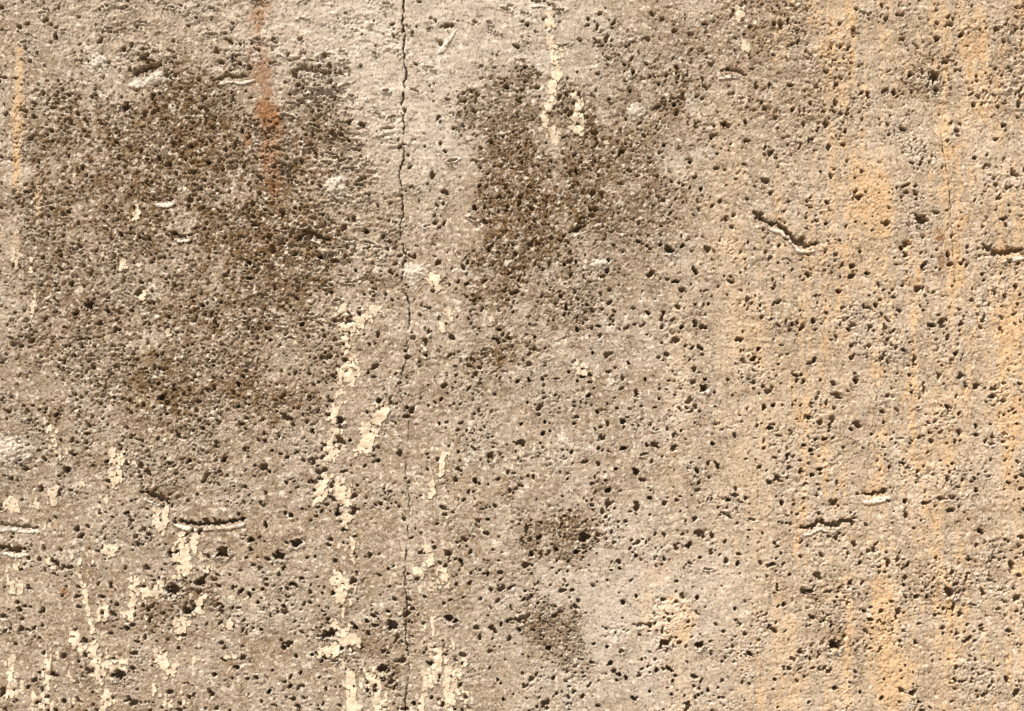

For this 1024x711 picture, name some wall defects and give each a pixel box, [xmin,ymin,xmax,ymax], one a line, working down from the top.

corrosion [240,0,285,199]
peeling [0,550,29,595]
peeling [3,647,77,711]
peeling [97,446,137,509]
peeling [68,497,234,711]
damp [0,33,379,520]
peeling [312,302,390,566]
peeling [316,569,396,711]
crack [349,0,411,710]
peeling [412,542,450,594]
peeling [408,614,469,711]
damp [439,0,1024,711]